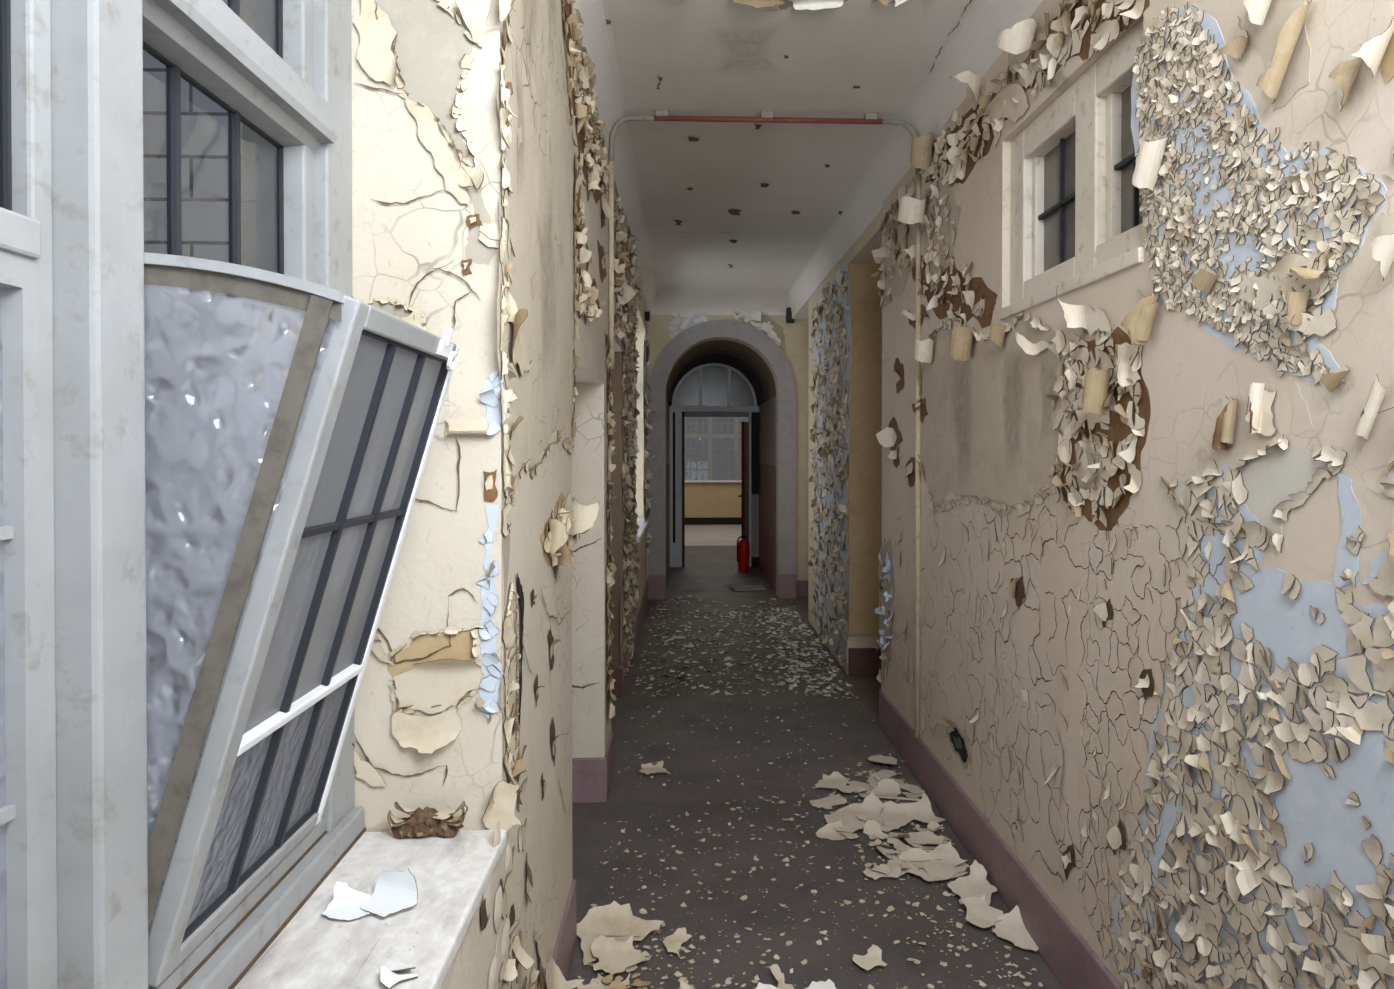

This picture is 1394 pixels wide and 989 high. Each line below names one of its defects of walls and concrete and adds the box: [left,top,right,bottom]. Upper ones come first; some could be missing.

crack [354,82,403,94]
crack [372,190,443,205]
crack [561,0,575,300]
crack [928,0,972,75]
crack [409,261,480,329]
peeling [351,0,1043,989]
peeling [871,0,1394,989]
crack [517,572,596,755]
crack [888,505,1236,984]